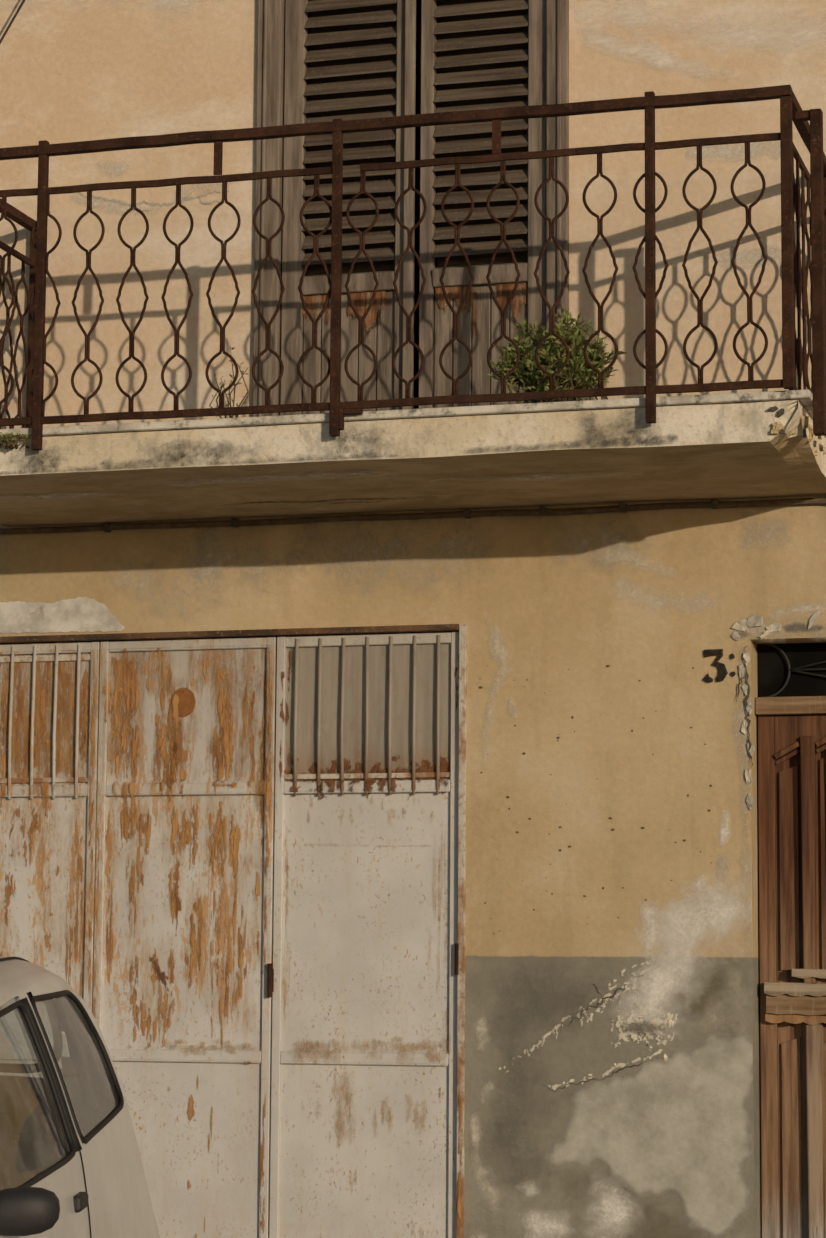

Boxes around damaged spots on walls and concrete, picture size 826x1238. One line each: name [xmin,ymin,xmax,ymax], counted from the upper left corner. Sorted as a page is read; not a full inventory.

peeling [496,282,528,321]
flaking render [731,611,825,814]
rust [0,646,450,1052]
damp [630,879,737,1019]
crack [499,952,669,1072]
crack [542,1013,678,1092]
rust [187,1078,199,1121]
damp [528,1214,566,1238]
damp [593,1189,631,1230]